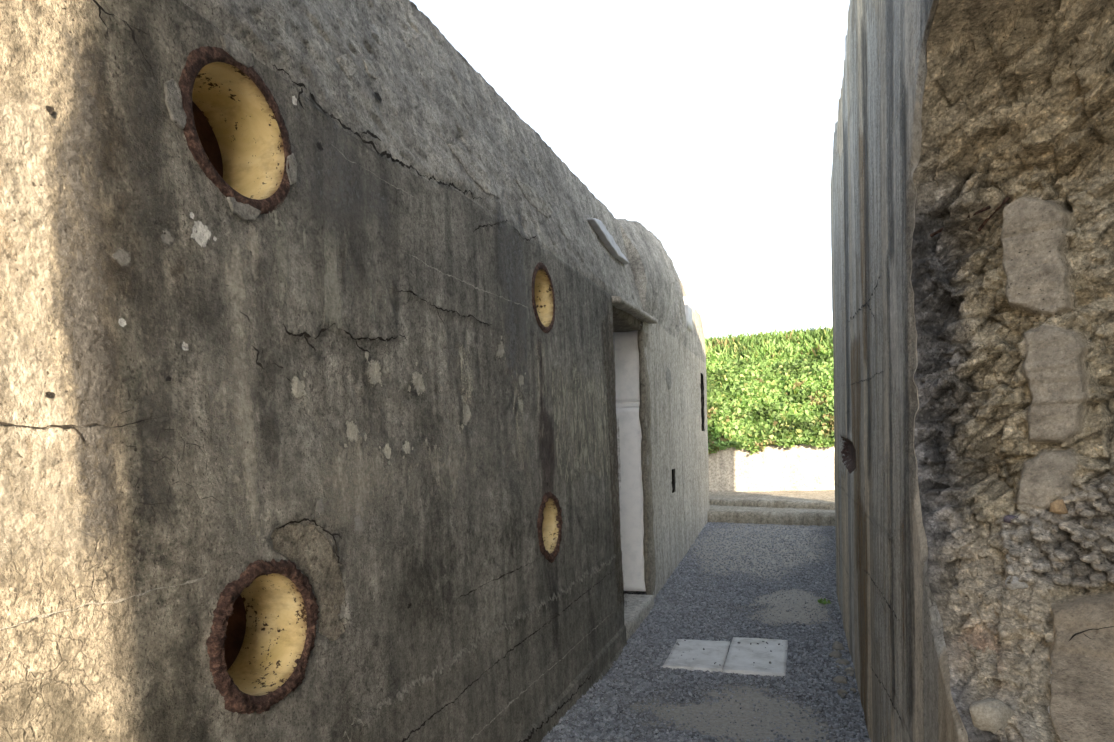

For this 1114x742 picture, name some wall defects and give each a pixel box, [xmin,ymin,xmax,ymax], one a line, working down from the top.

crack [272,65,537,241]
leakage [0,34,121,558]
leakage [123,18,289,543]
crack [283,323,407,353]
crack [391,288,491,329]
crack [0,410,223,515]
leakage [322,432,394,527]
crack [276,518,344,568]